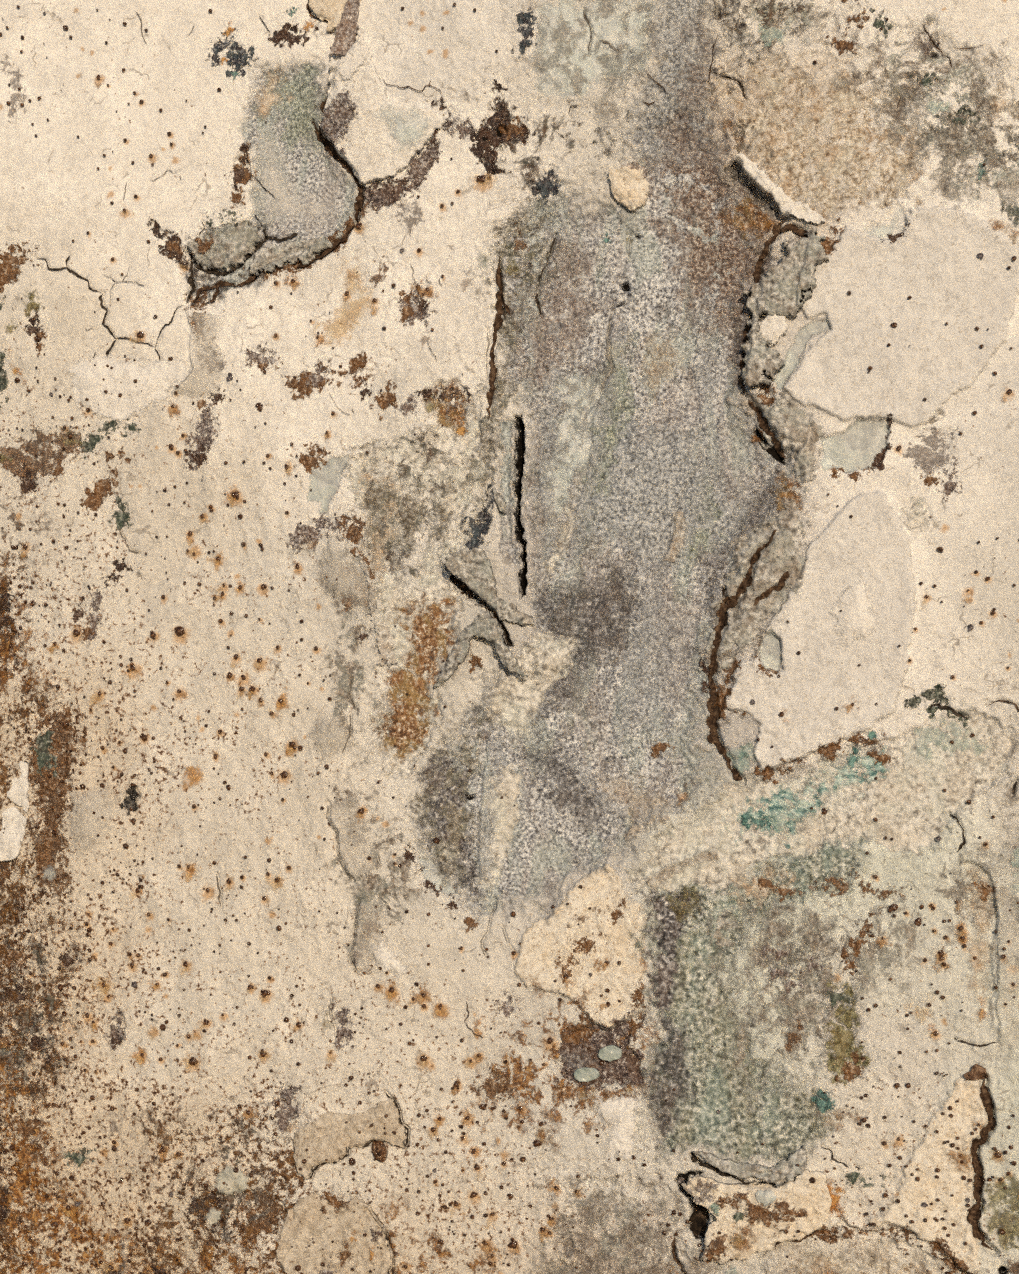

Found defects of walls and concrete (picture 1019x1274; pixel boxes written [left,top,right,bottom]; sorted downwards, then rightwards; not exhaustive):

crack [37,94,364,360]
spalling [188,0,447,300]
rust [35,355,142,456]
crack [503,628,512,646]
spalling [276,0,1019,1274]
crack [706,529,790,781]
rust [0,487,659,1274]
leakage [730,867,922,1052]
leakage [937,861,1019,934]